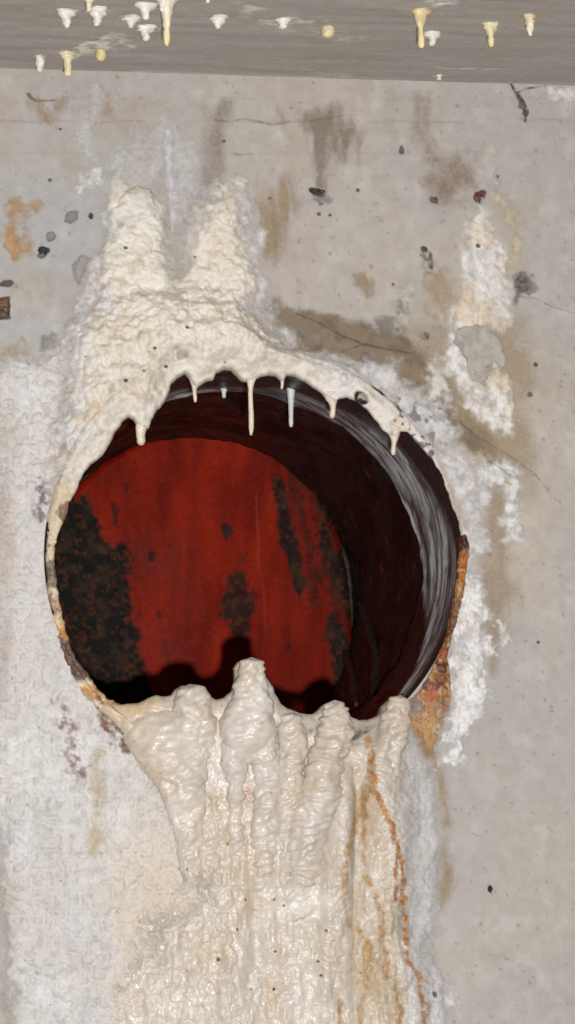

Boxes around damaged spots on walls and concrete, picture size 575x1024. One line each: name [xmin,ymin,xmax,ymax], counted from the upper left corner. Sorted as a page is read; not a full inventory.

rust [5,198,43,259]
damp [0,111,461,1024]
damp [266,180,529,767]
rust [409,535,470,755]
rust [343,736,430,1021]